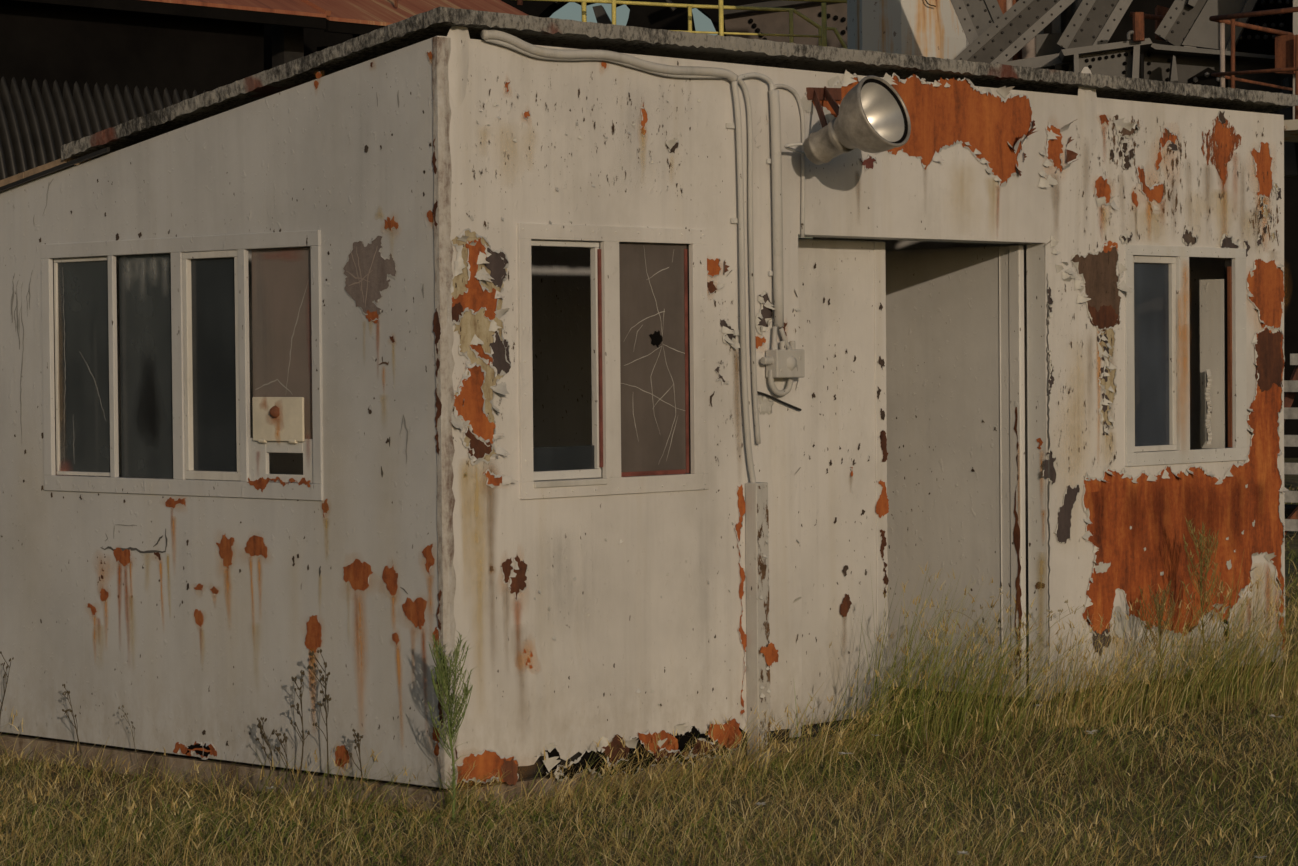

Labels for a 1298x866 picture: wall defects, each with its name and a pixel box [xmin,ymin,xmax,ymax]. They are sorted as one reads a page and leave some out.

peeling [1076,110,1282,257]
peeling [343,236,397,331]
peeling [450,213,515,521]
peeling [1043,179,1142,544]
rust [1082,114,1289,656]
rust [165,497,186,528]
rust [87,548,132,638]
rust [193,609,204,627]
rust [194,535,267,599]
rust [304,615,322,681]
peeling [542,736,739,782]
peeling [658,723,709,748]